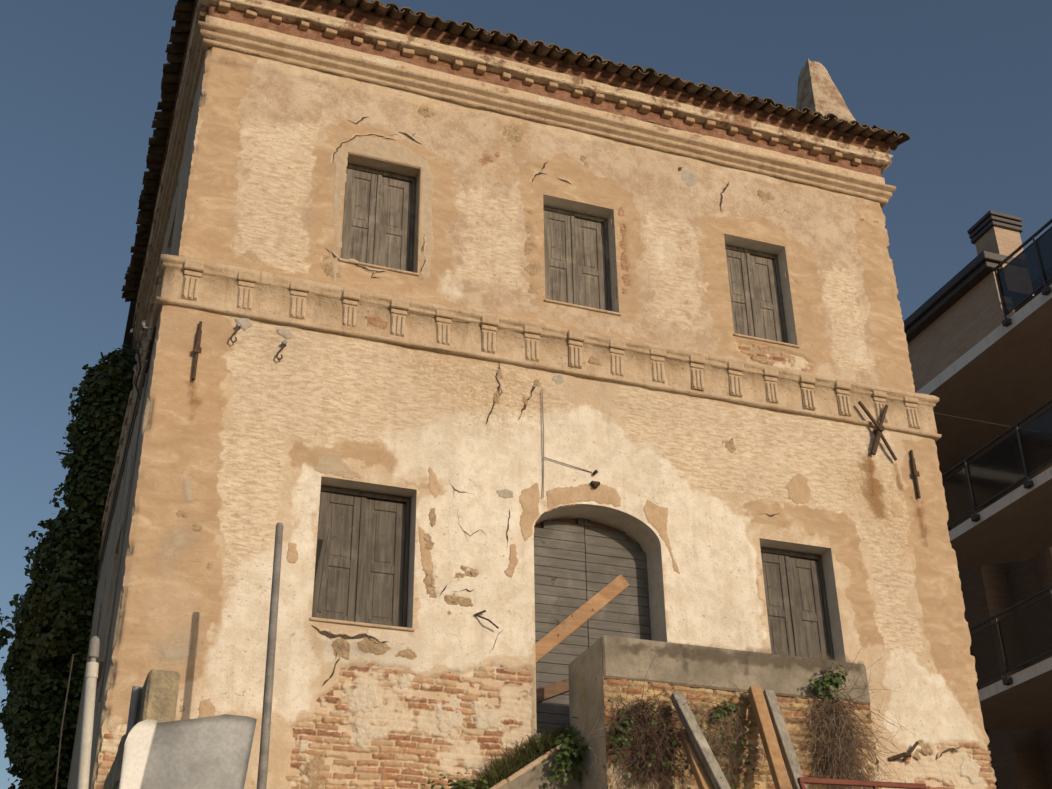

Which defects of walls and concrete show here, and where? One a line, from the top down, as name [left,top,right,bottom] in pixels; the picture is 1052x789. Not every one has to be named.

crack [330,115,422,164]
crack [530,161,572,184]
flaking render [611,207,631,299]
flaking render [738,343,814,372]
crack [486,362,541,424]
flaking render [418,467,474,615]
flaking render [454,565,478,578]
peeling [504,483,621,578]
peeling [643,500,680,574]
flaking render [96,724,127,789]
flaking render [285,662,533,789]
flaking render [904,740,996,789]